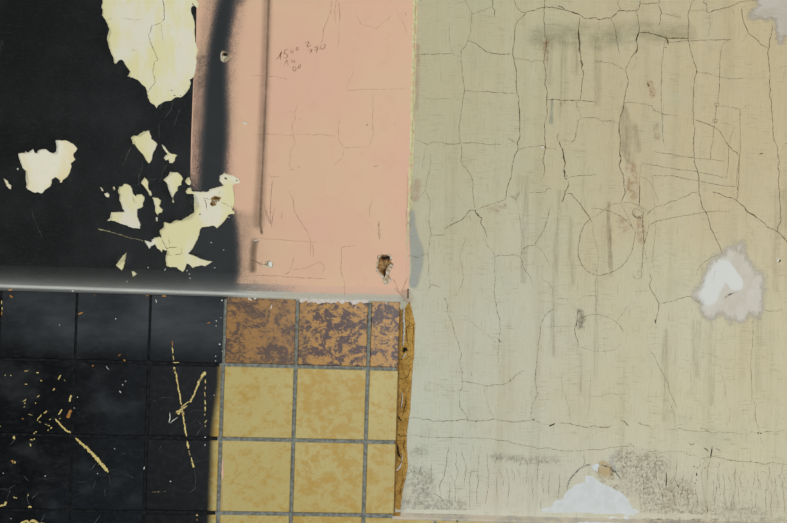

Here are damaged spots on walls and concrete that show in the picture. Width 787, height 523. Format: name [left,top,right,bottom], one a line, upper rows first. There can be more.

peeling [102,0,199,108]
peeling [17,140,77,193]
peeling [100,131,240,272]
peeling [116,253,137,277]
hole [376,254,403,291]
crack [379,0,787,515]